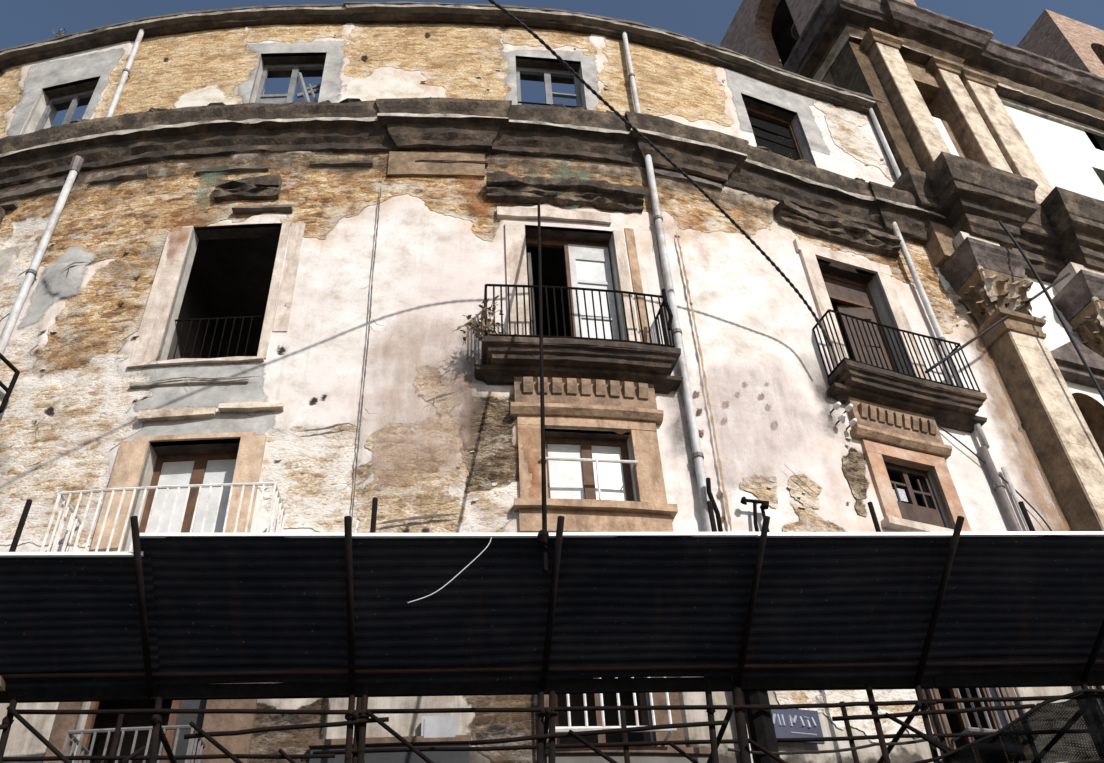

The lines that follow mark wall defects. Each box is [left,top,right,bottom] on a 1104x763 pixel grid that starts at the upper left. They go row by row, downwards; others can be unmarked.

flaking render [0,65,23,139]
flaking render [93,21,734,126]
flaking render [813,101,897,181]
flaking render [791,228,966,334]
flaking render [0,148,777,547]
flaking render [740,474,846,532]
flaking render [842,436,869,516]
flaking render [249,698,330,763]